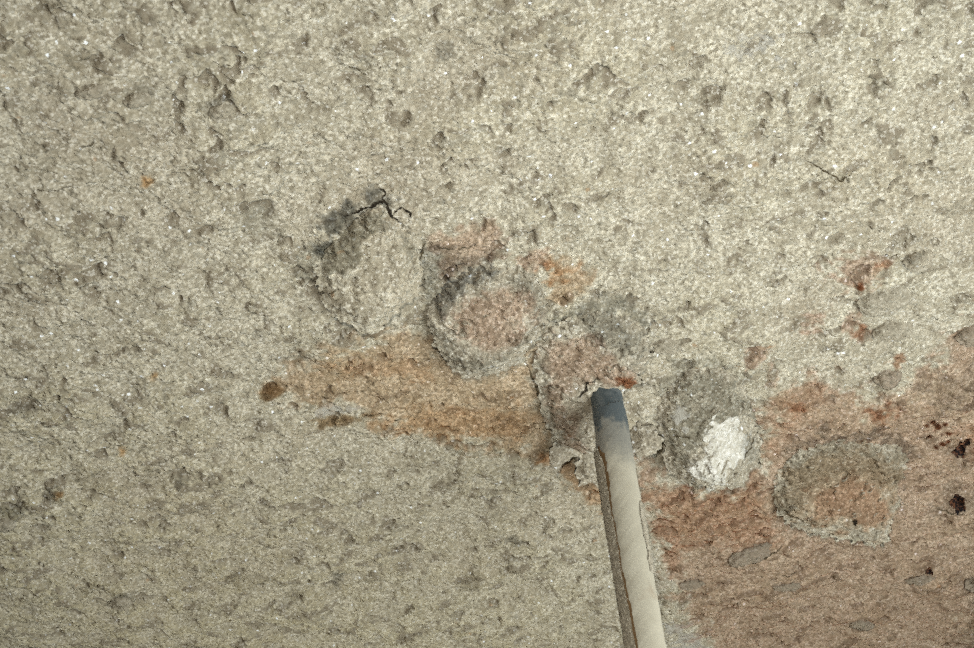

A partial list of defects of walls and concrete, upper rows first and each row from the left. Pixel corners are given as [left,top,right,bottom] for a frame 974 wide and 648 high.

peeling [426,264,656,488]
peeling [630,366,764,491]